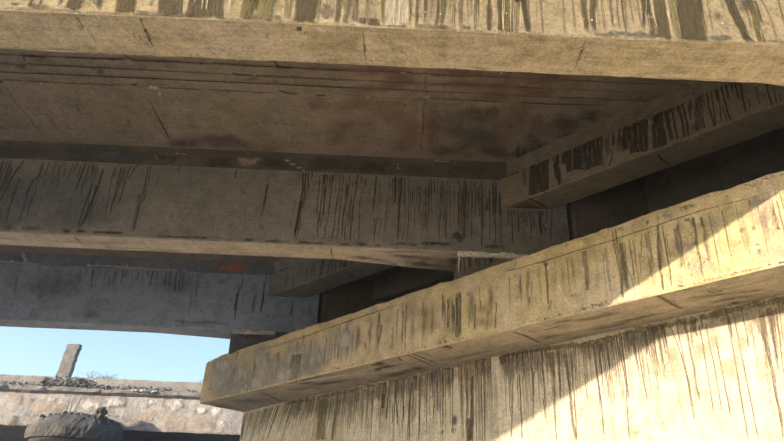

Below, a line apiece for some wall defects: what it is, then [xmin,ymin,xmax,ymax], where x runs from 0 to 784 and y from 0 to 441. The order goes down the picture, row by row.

damp [58,0,101,10]
damp [150,0,230,17]
damp [240,0,544,31]
damp [506,78,781,195]
damp [0,148,180,232]
damp [288,147,552,266]
damp [442,292,461,337]
damp [240,302,784,441]